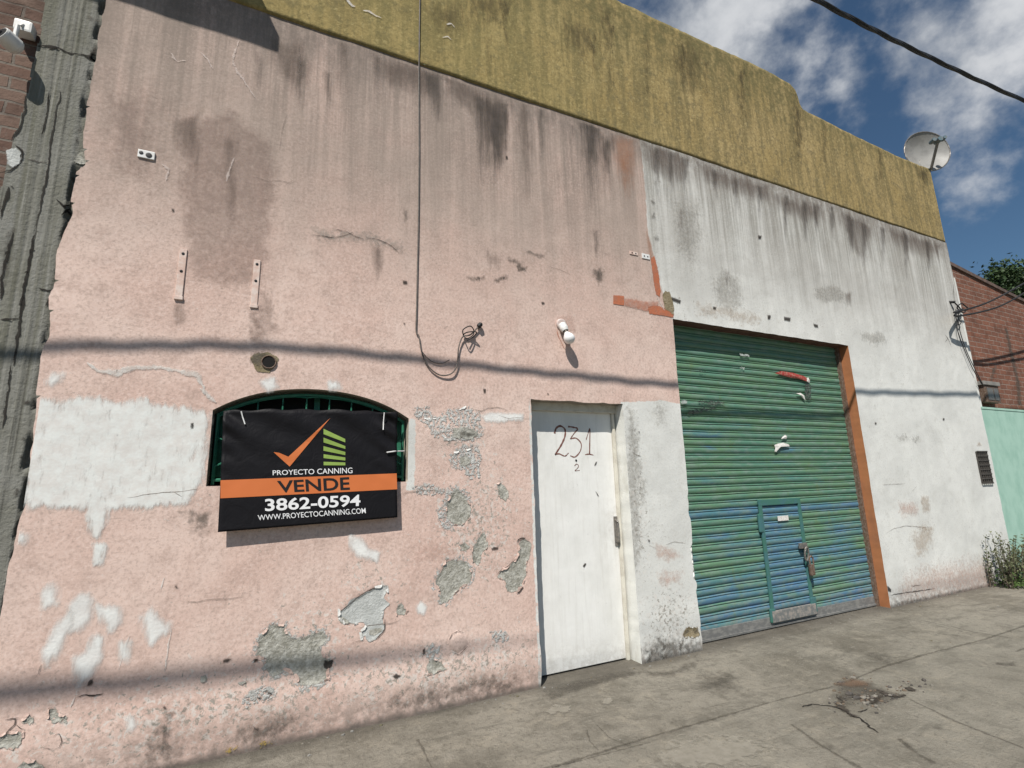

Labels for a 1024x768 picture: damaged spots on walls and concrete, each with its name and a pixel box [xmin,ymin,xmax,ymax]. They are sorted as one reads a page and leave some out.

spalling [6,148,21,167]
crack [87,362,216,402]
peeling [412,406,523,532]
peeling [338,532,498,642]
spalling [498,537,531,594]
spalling [238,621,336,708]
spalling [0,713,33,751]
spalling [47,708,67,724]